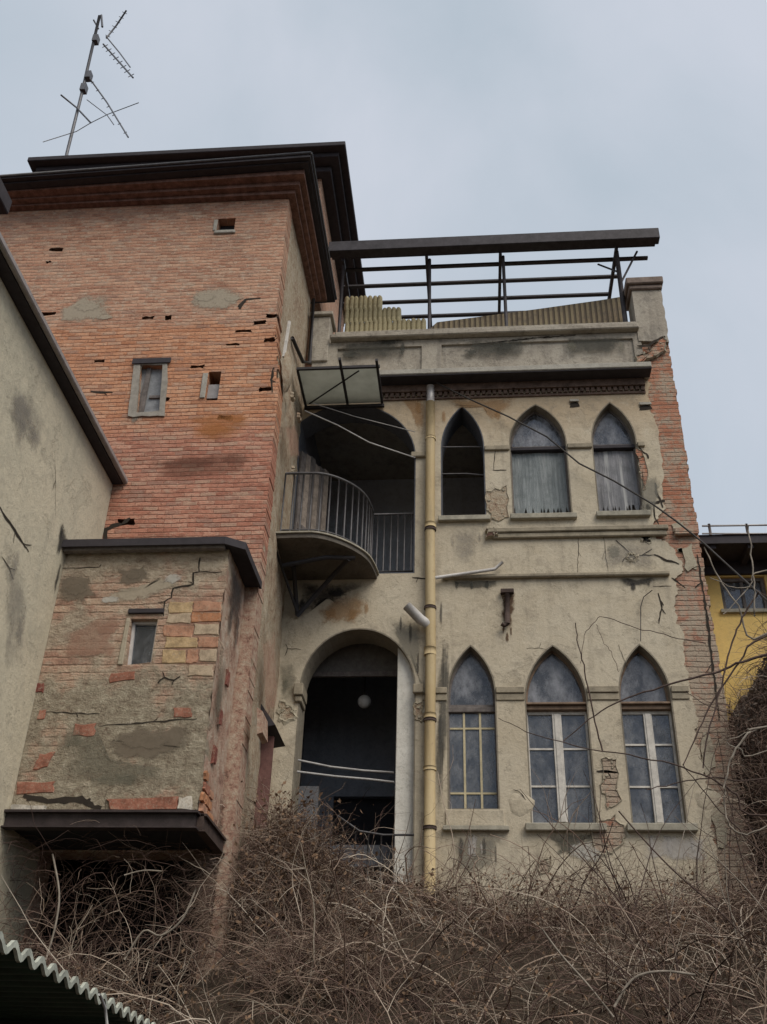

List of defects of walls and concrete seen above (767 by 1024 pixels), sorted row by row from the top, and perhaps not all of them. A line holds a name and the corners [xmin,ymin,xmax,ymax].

flaking render [634,336,667,362]
flaking render [635,448,649,491]
flaking render [485,485,509,540]
crack [0,507,31,580]
flaking render [625,524,652,564]
flaking render [677,543,697,572]
crack [158,557,218,616]
flaking render [162,601,230,687]
crack [577,538,720,720]
crack [47,711,197,727]
crack [23,794,102,809]
flaking render [590,756,627,858]